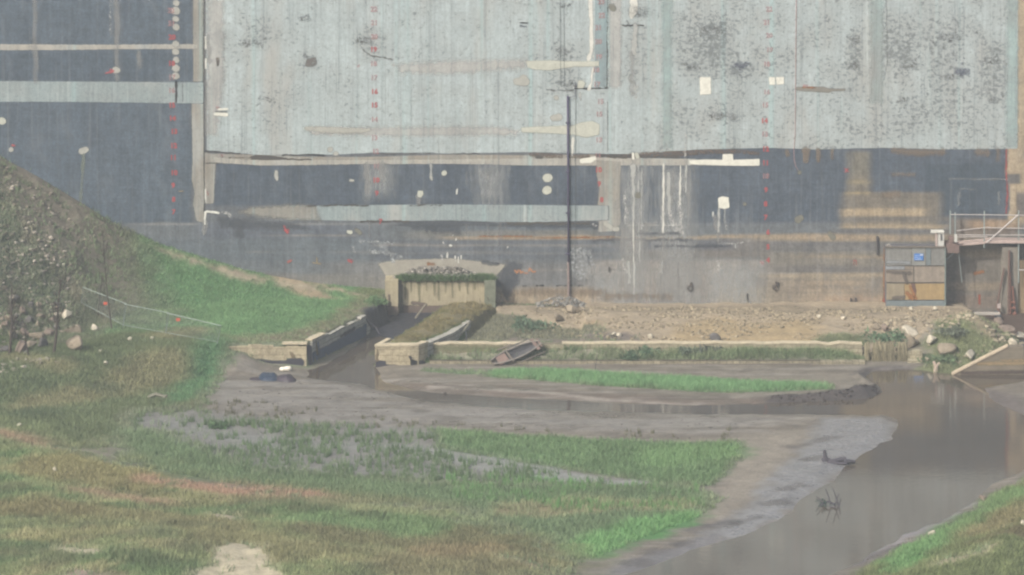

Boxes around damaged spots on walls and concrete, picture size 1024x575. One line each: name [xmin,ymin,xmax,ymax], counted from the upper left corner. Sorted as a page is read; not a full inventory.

water stain [353,134,742,315]